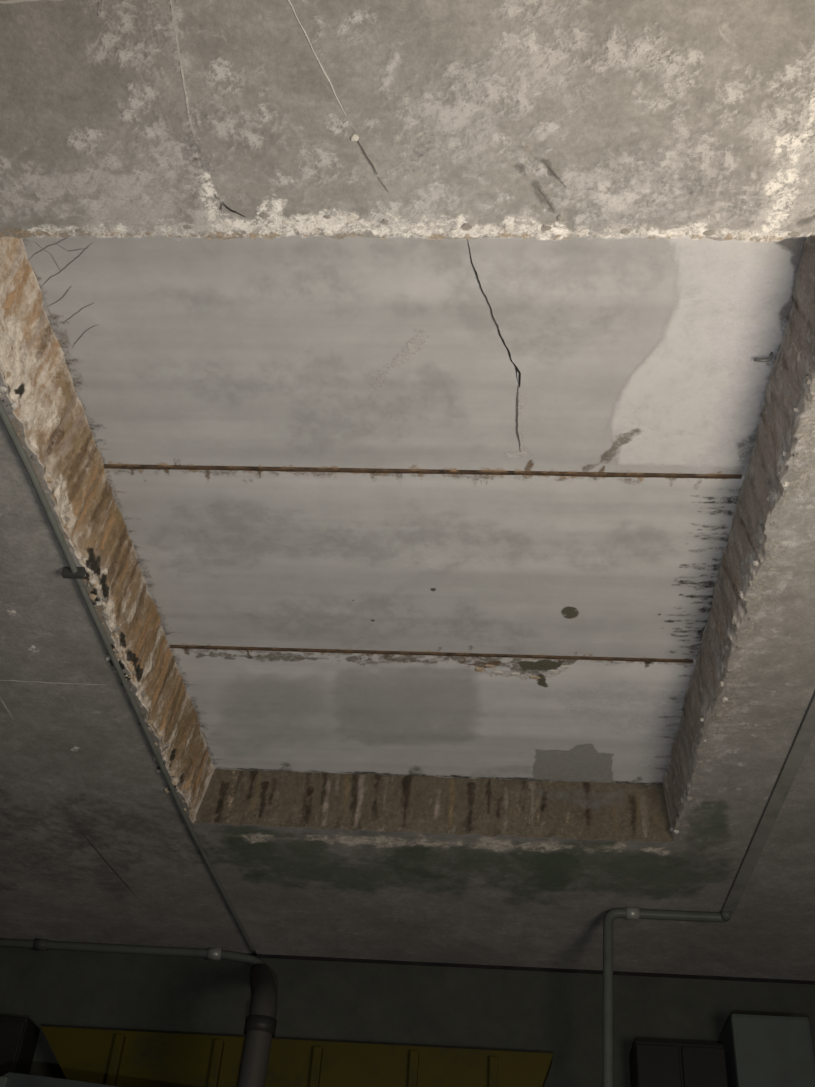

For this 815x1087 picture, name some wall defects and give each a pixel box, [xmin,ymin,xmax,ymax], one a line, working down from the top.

damp [0,0,815,470]
crack [467,239,526,458]
spalling [0,384,25,409]
corrosion [0,228,742,842]
spalling [84,548,109,607]
damp [0,318,195,821]
damp [670,332,815,848]
spalling [106,632,143,694]
peeling [196,652,319,662]
peeling [385,656,577,687]
damp [444,744,662,808]
damp [307,832,462,873]